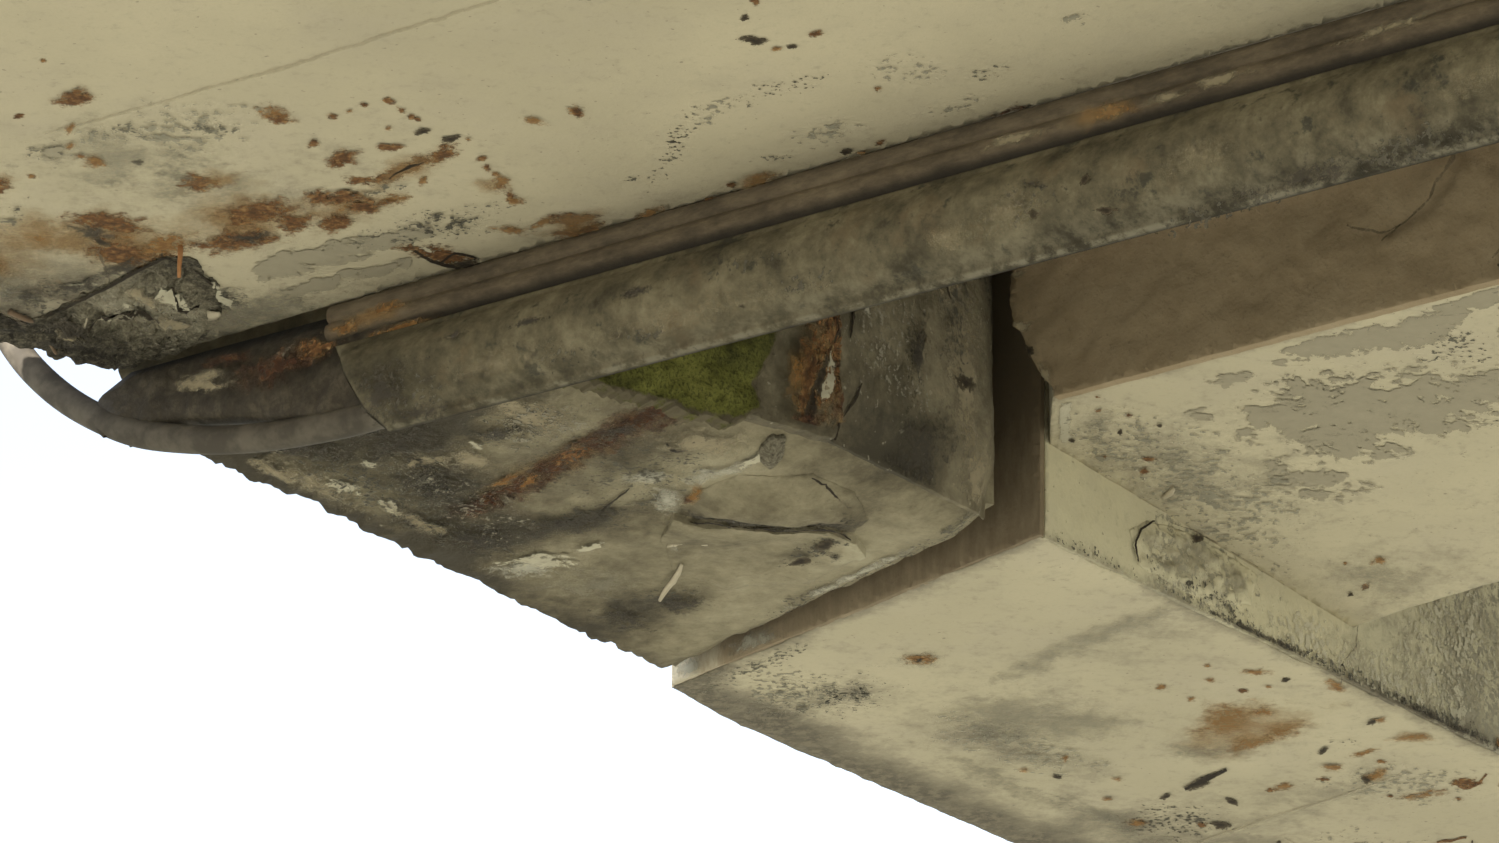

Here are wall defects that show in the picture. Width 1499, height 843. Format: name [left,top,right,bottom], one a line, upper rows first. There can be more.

rust [51,86,93,106]
rust [60,98,524,273]
rust [491,212,605,240]
leakage [624,74,829,193]
crack [1347,154,1456,241]
spalling [0,253,234,371]
peeling [1206,286,1499,504]
leakage [276,356,760,556]
rust [446,406,677,518]
rust [1189,669,1299,751]
leakage [1158,578,1499,749]